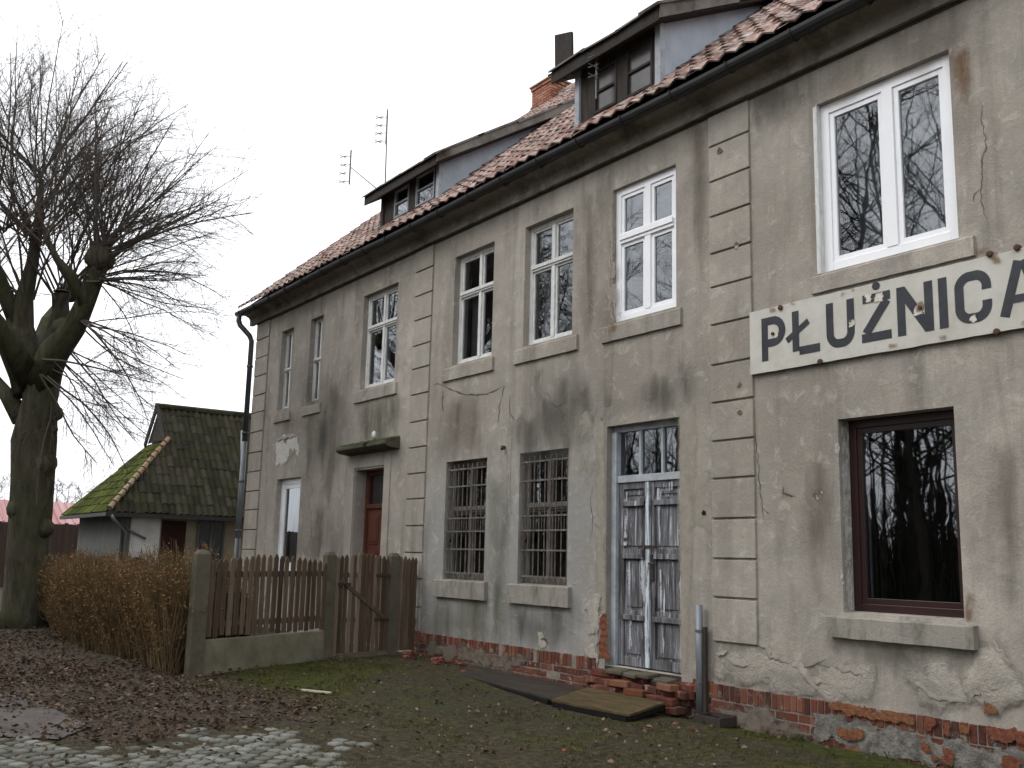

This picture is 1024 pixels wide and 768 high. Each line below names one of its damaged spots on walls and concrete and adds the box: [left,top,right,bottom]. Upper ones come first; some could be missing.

crack [973,102,988,226]
crack [434,383,514,419]
flaking render [275,434,299,466]
flaking render [584,593,610,663]
flaking render [828,701,970,768]
flaking render [983,703,1024,768]